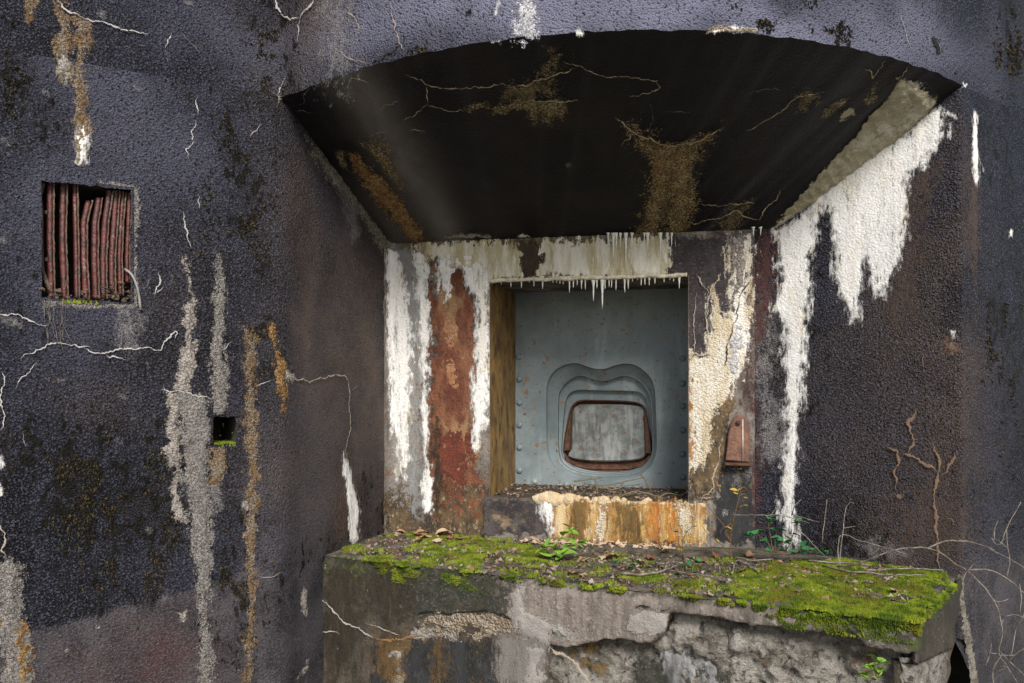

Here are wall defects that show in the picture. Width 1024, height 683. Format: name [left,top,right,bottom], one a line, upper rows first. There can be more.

damp [47,0,148,167]
crack [361,77,509,137]
crack [567,61,660,97]
crack [0,313,178,445]
damp [160,251,263,683]
corrosion [418,256,709,547]
damp [304,107,957,547]
spalling [410,581,949,683]